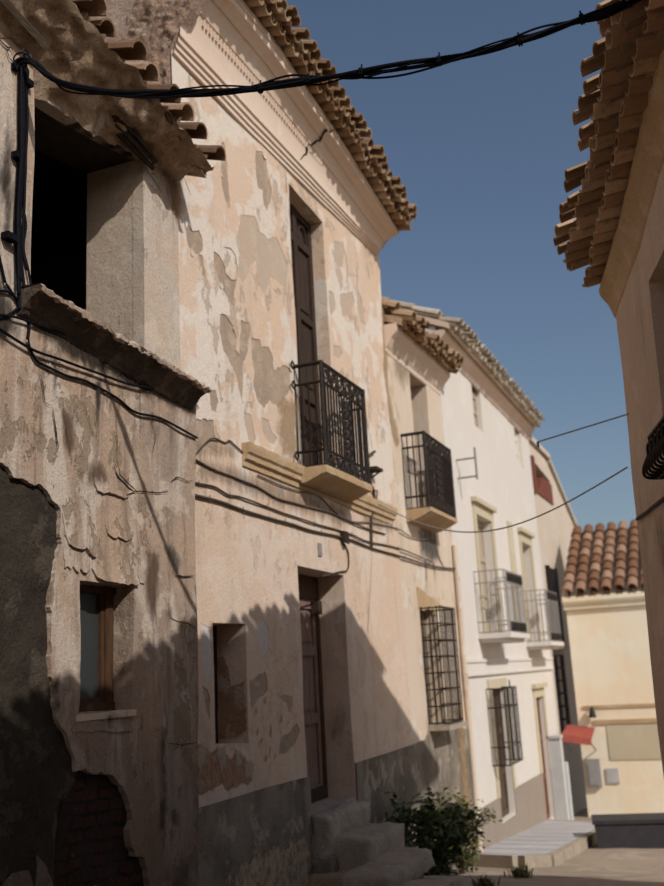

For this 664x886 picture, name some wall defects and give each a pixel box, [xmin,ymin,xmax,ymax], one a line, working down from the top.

peeling [220,143,230,208]
peeling [255,151,271,210]
crack [300,129,334,160]
peeling [186,215,288,306]
peeling [329,290,365,325]
peeling [219,314,290,444]
peeling [196,390,218,453]
spalling [0,466,144,886]
spalling [198,624,300,795]